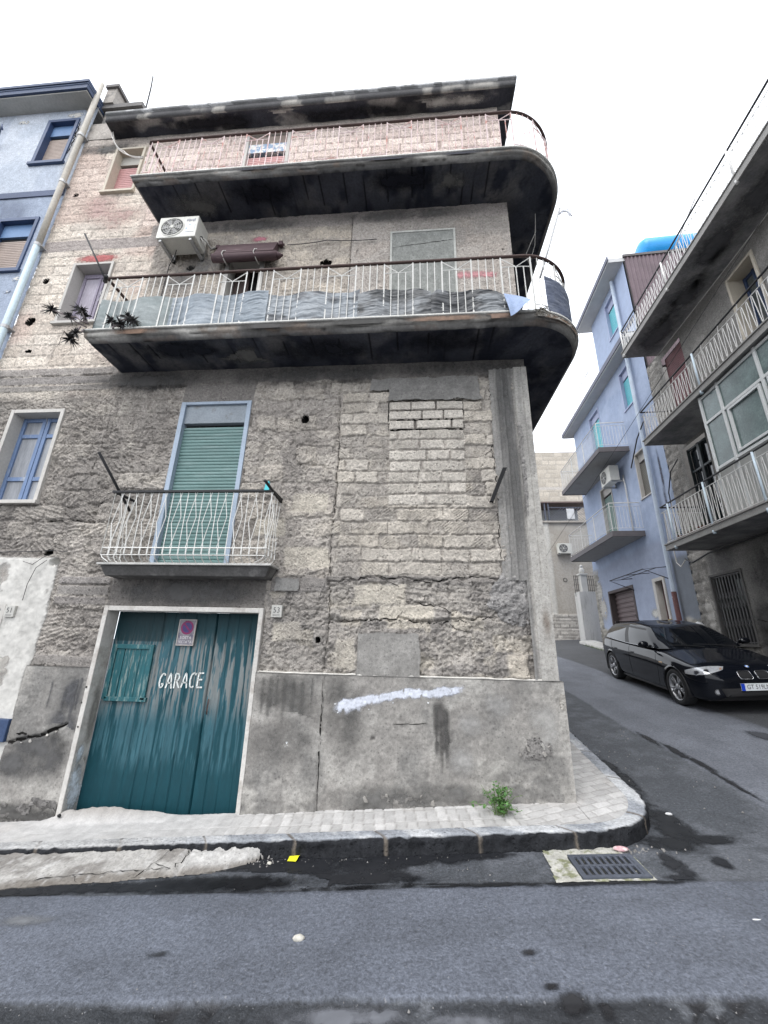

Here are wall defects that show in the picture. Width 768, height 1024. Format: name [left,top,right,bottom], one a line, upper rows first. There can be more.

leakage [373,171,464,190]
leakage [176,196,294,231]
leakage [350,208,452,221]
leakage [147,341,383,383]
leakage [102,373,199,391]
crack [316,390,502,808]
crack [8,724,67,744]
leakage [435,704,472,771]